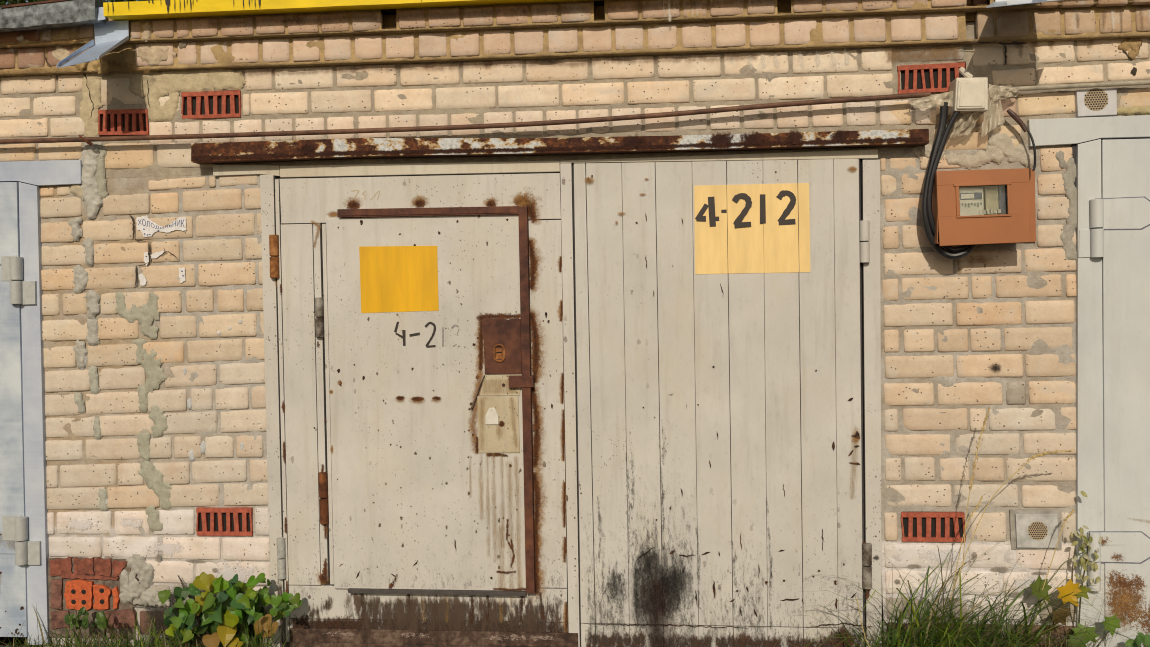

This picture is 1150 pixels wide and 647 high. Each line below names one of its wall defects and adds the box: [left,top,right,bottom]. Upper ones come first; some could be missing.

corrosion [192,129,923,162]
corrosion [514,193,537,223]
corrosion [529,239,539,290]
corrosion [278,301,569,643]
peeling [146,543,257,581]
damp [588,475,701,646]
damp [707,558,799,646]
corrosion [1101,538,1150,634]